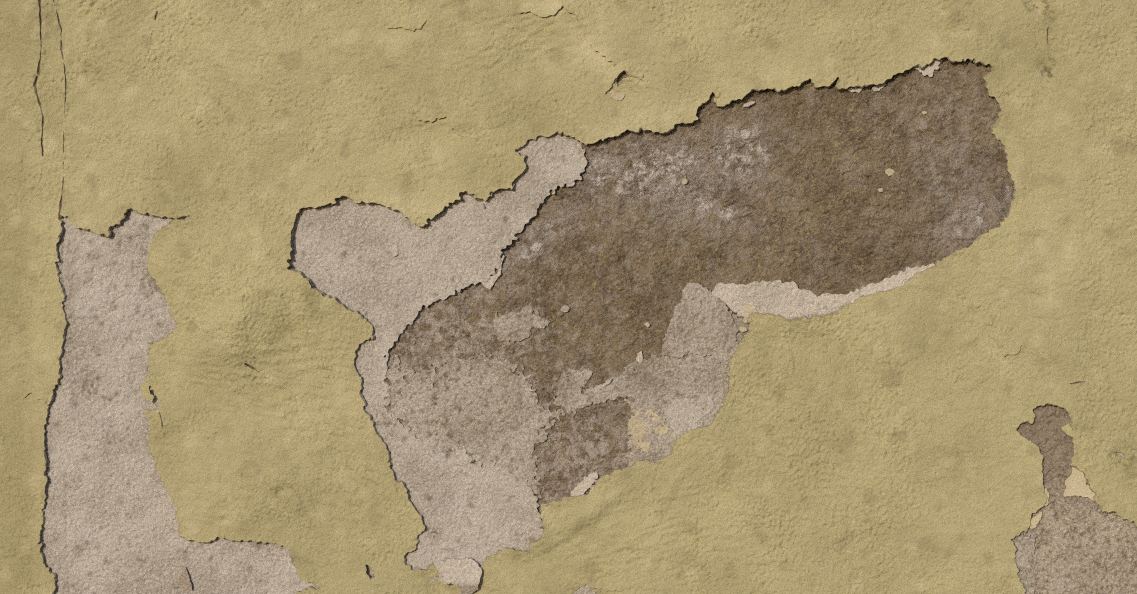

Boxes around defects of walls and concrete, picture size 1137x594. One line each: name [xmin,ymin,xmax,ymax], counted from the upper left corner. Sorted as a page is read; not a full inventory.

crack [35,0,67,156]
flaking render [39,209,318,594]
flaking render [287,58,1014,594]
flaking render [1011,404,1137,594]